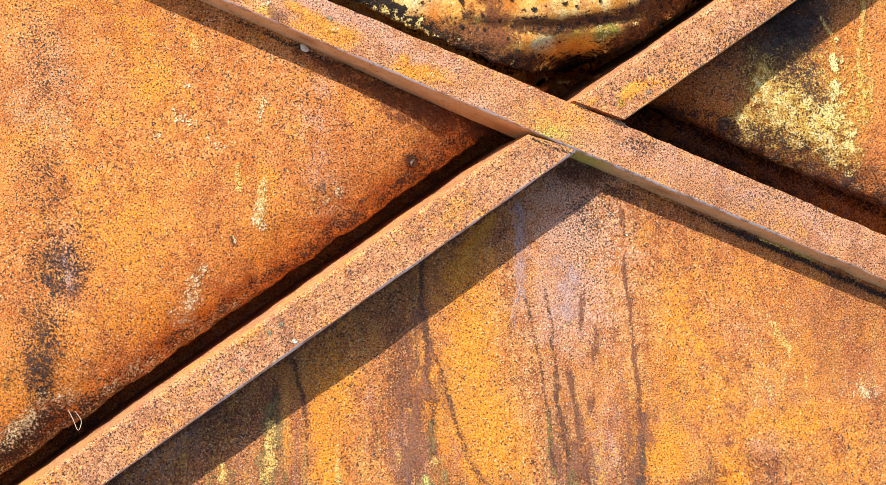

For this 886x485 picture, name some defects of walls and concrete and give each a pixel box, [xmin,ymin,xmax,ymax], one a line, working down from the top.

corrosion [256,0,355,41]
corrosion [210,10,491,140]
corrosion [855,0,874,126]
corrosion [398,153,429,176]
leakage [106,173,600,485]
leakage [619,207,657,485]
corrosion [208,462,236,485]